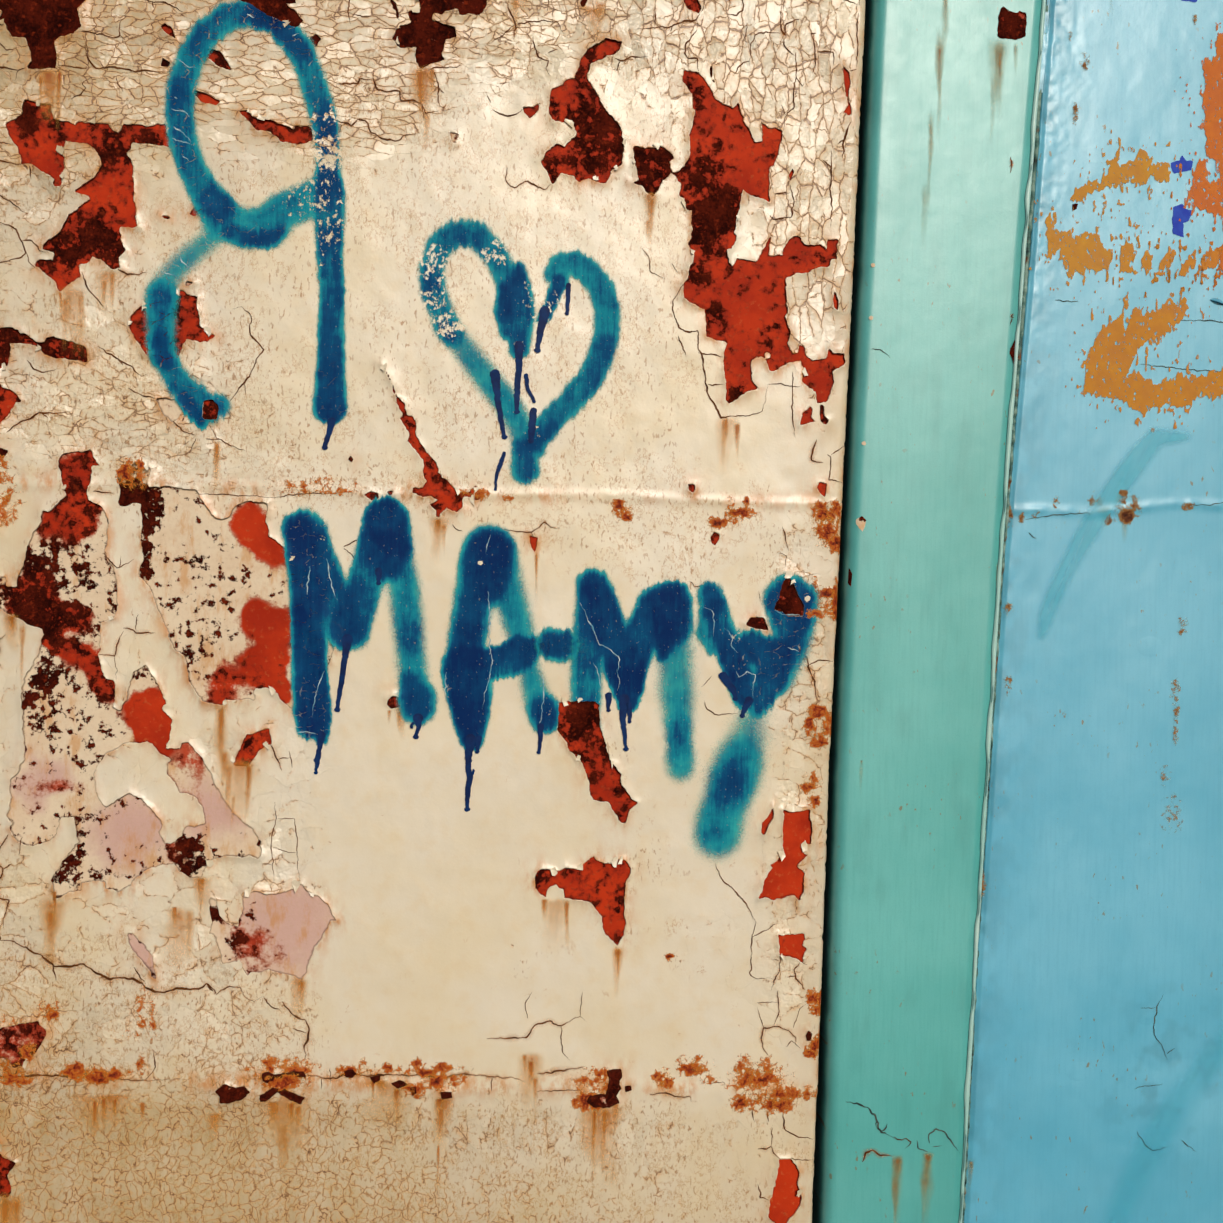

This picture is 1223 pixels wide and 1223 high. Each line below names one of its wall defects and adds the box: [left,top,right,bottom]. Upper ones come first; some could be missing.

peeling [6,100,169,291]
crack [331,63,462,142]
peeling [523,38,845,425]
crack [615,0,860,126]
crack [642,248,844,482]
peeling [0,450,262,898]
peeling [117,461,310,709]
crack [0,835,585,1092]
corrosion [211,1054,321,1119]
corrosion [336,1056,467,1125]
corrosion [571,1066,632,1138]
corrosion [651,1054,818,1116]